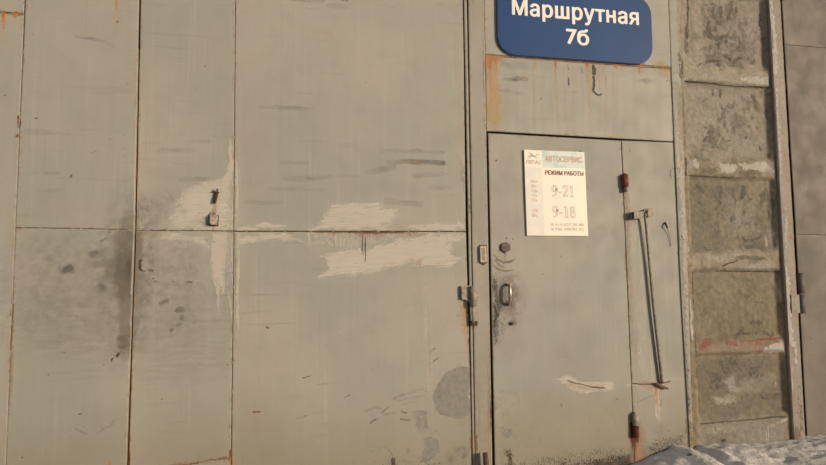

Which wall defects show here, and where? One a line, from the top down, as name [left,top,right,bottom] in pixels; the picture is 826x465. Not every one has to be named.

rust [486,55,671,123]
rust [630,422,651,464]